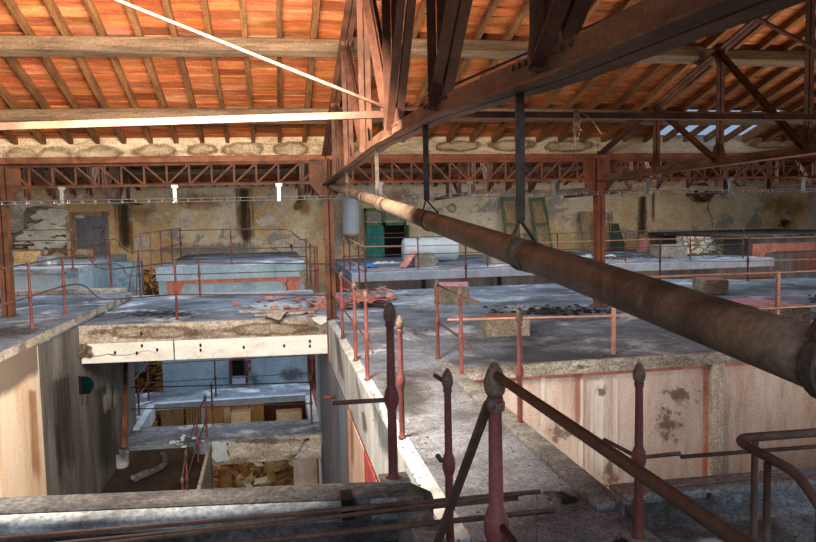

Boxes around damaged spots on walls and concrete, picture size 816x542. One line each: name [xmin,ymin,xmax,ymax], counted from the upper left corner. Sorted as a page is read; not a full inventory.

spalling [11,206,69,257]
damp [115,204,133,251]
damp [167,188,258,255]
spalling [78,343,95,358]
damp [658,388,700,441]